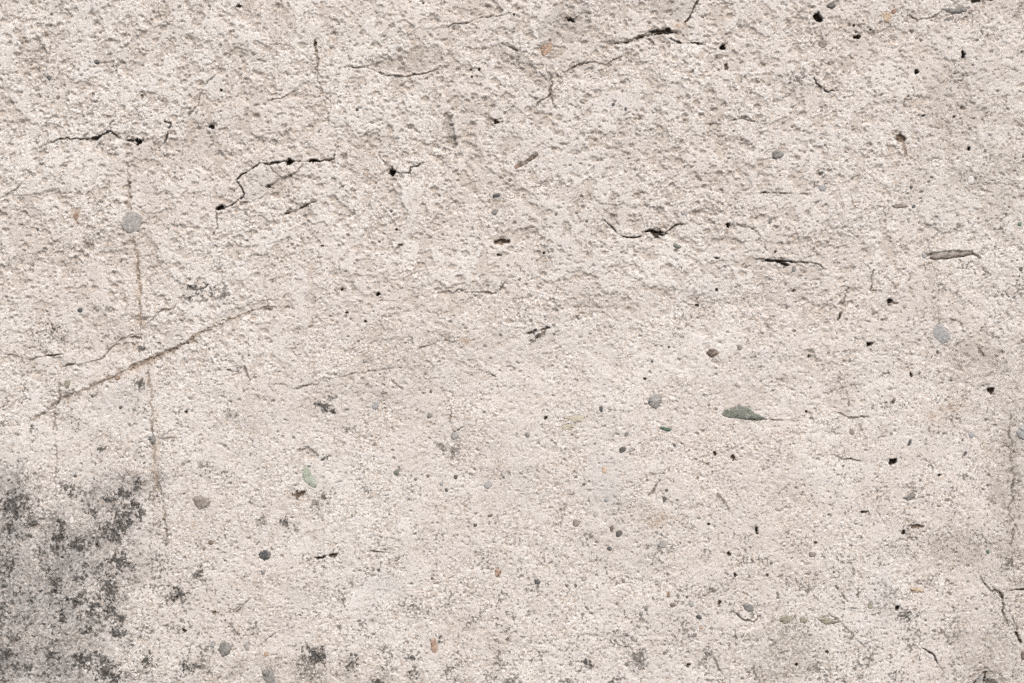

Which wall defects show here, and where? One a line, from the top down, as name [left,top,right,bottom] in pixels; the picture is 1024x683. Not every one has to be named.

crack [536,0,705,106]
crack [40,77,213,209]
crack [213,153,335,235]
crack [604,219,702,238]
damp [0,474,146,683]